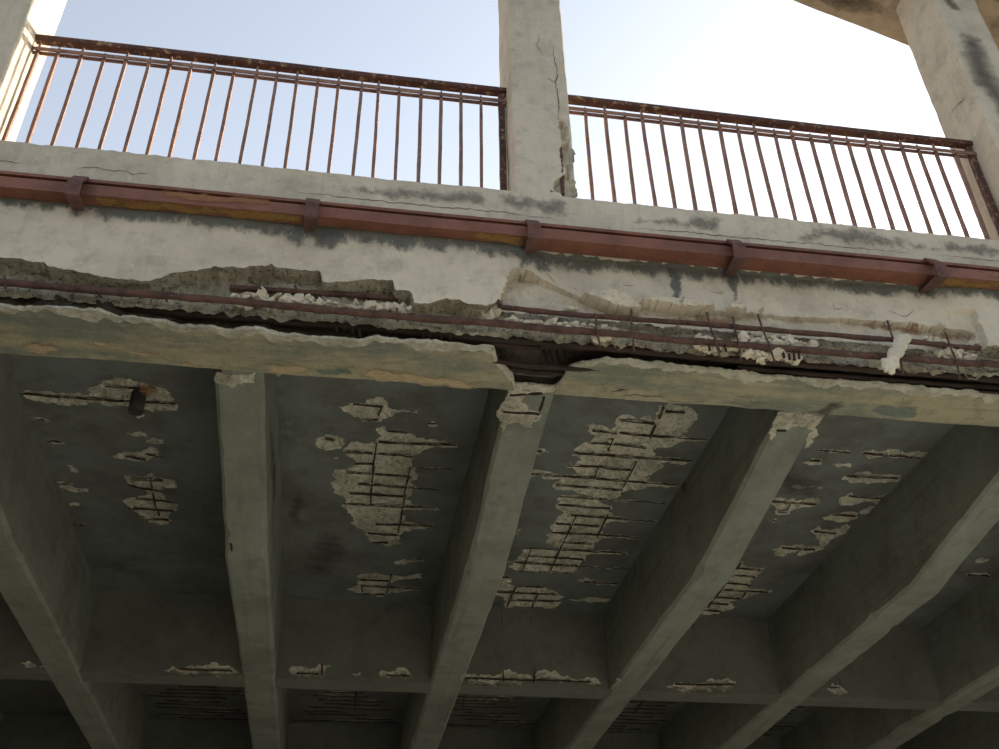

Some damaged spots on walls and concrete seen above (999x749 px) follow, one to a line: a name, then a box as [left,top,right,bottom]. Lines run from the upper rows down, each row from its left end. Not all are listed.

crack [536,41,559,120]
water stain [968,41,999,101]
spalling [0,257,999,431]
spalling [57,465,89,506]
spalling [113,431,165,462]
spalling [123,472,179,525]
spalling [315,396,458,547]
spalling [496,403,707,609]
spalling [347,558,426,597]
spalling [701,562,773,615]
spalling [447,669,600,727]